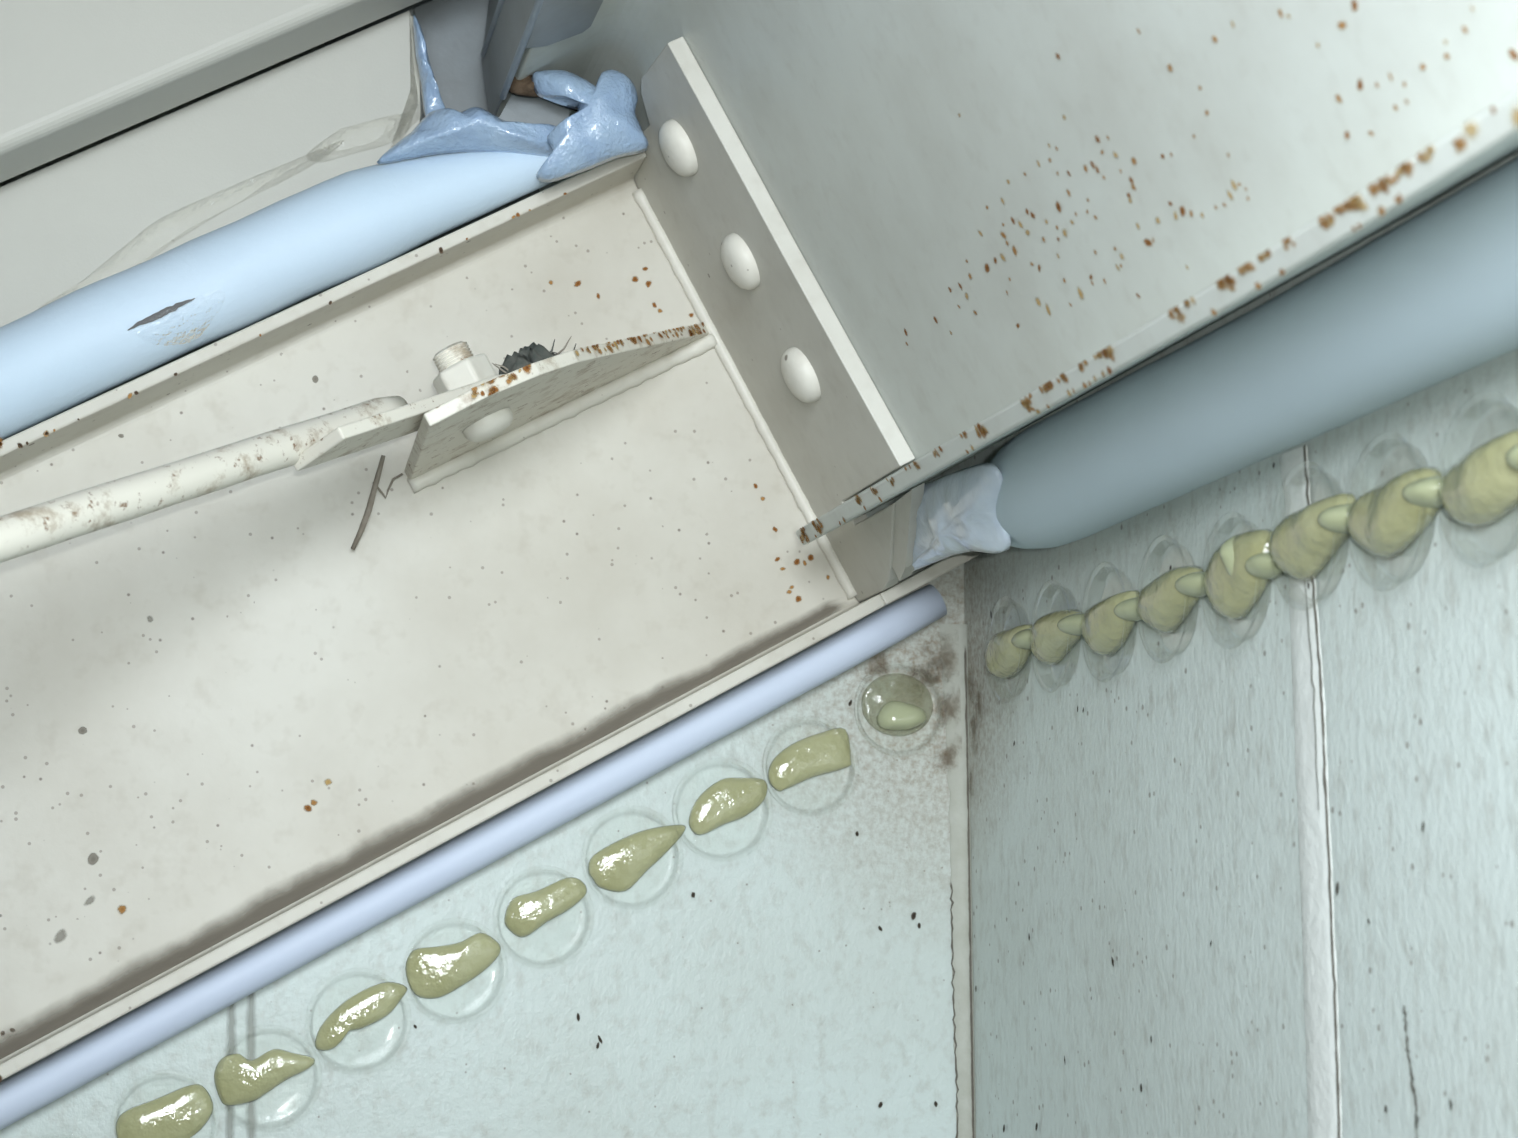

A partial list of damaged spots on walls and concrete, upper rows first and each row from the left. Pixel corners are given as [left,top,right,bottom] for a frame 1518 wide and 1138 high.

rust [1453,123,1476,152]
rust [948,136,1136,315]
rust [1136,181,1249,246]
rust [1318,146,1434,232]
rust [1217,237,1295,291]
rust [1168,297,1195,323]
rust [471,364,531,398]
rust [1021,346,1114,414]
rust [959,423,988,454]
rust [855,446,943,510]
rust [775,518,846,602]